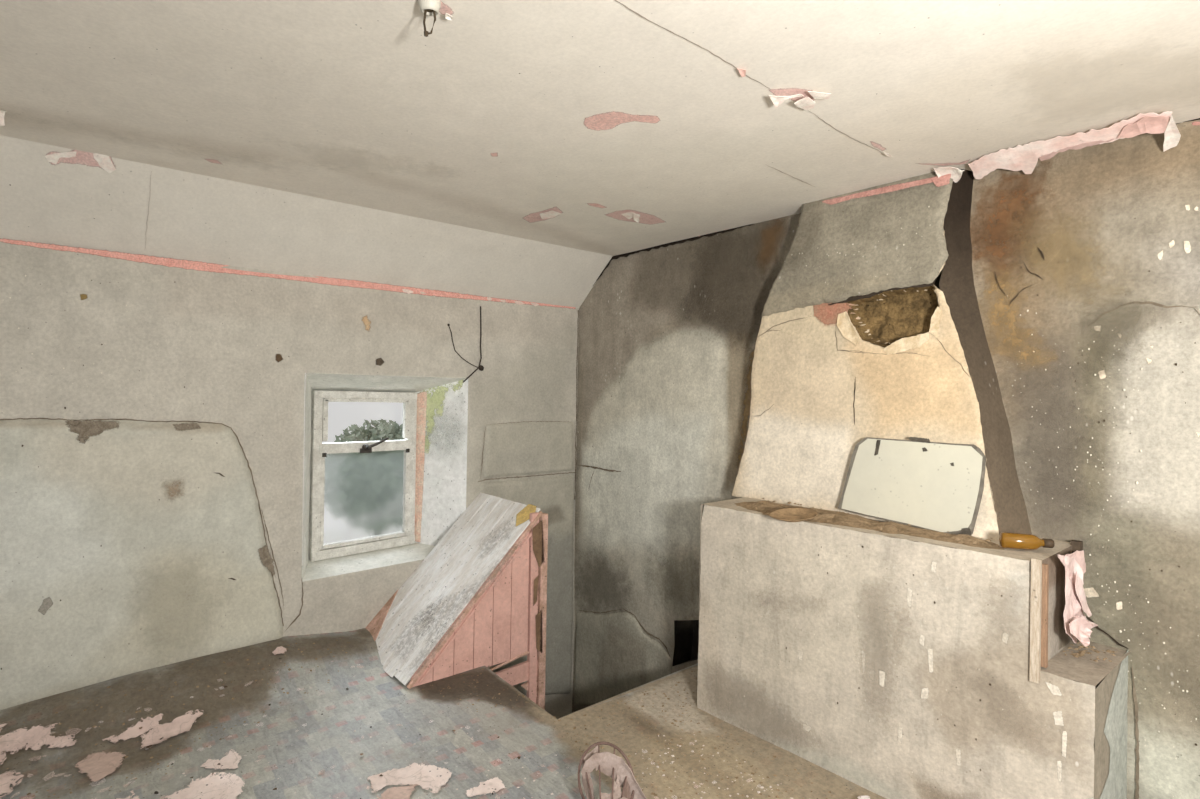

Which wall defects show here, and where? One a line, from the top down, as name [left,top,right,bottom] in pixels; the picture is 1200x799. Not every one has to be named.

crack [615,0,771,90]
peeling [584,112,660,131]
peeling [769,88,831,110]
peeling [45,150,116,173]
peeling [587,203,665,225]
crack [994,248,1044,305]
corrosion [970,172,1092,362]
spalling [813,277,942,355]